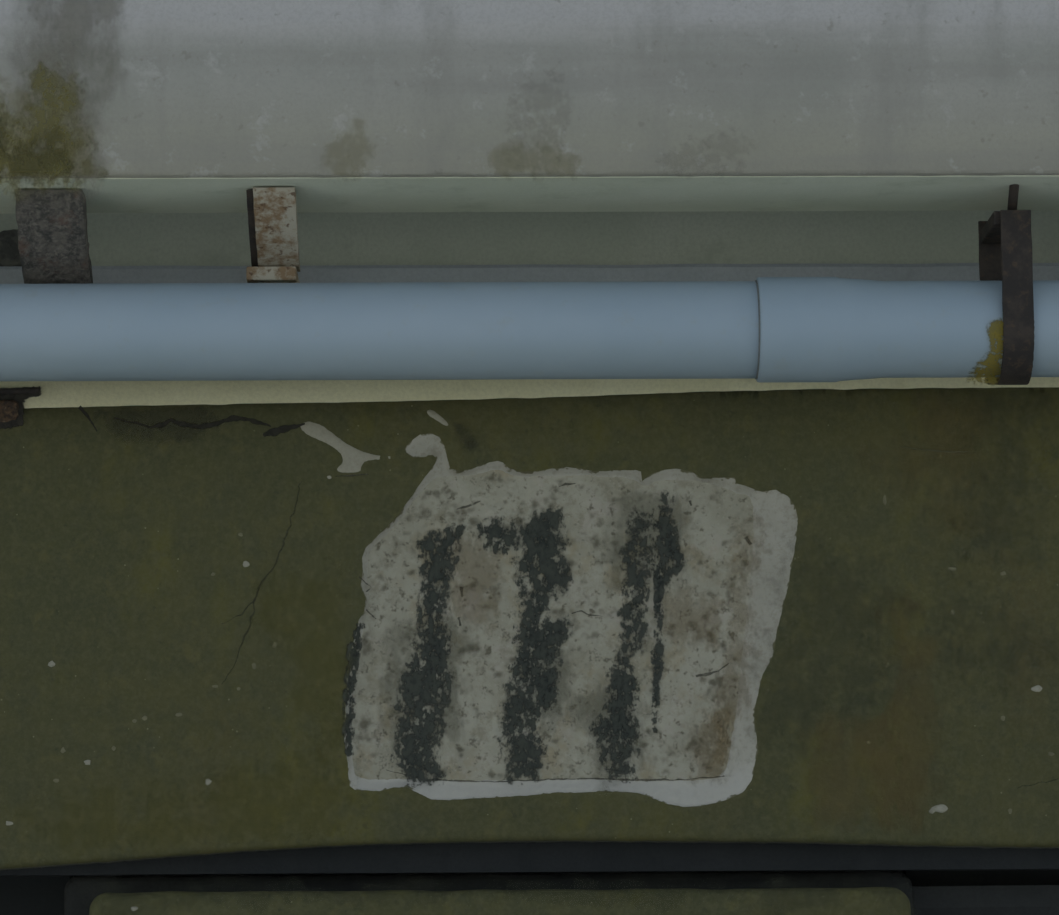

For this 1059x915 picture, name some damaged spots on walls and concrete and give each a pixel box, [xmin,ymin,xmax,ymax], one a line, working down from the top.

peeling [300,422,390,479]
spalling [342,410,798,807]